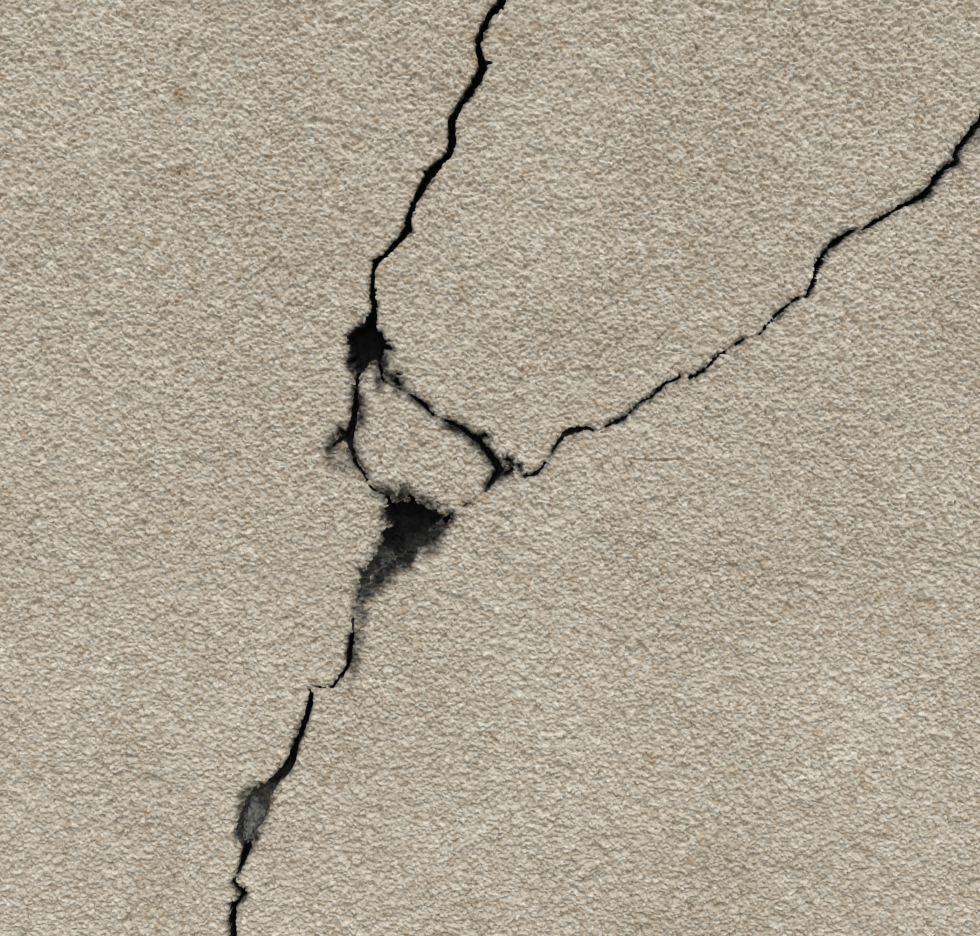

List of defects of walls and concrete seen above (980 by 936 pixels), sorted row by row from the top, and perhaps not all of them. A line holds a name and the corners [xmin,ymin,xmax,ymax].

crack [369,0,506,324]
crack [326,114,980,524]
crack [278,585,364,777]
crack [227,841,252,936]